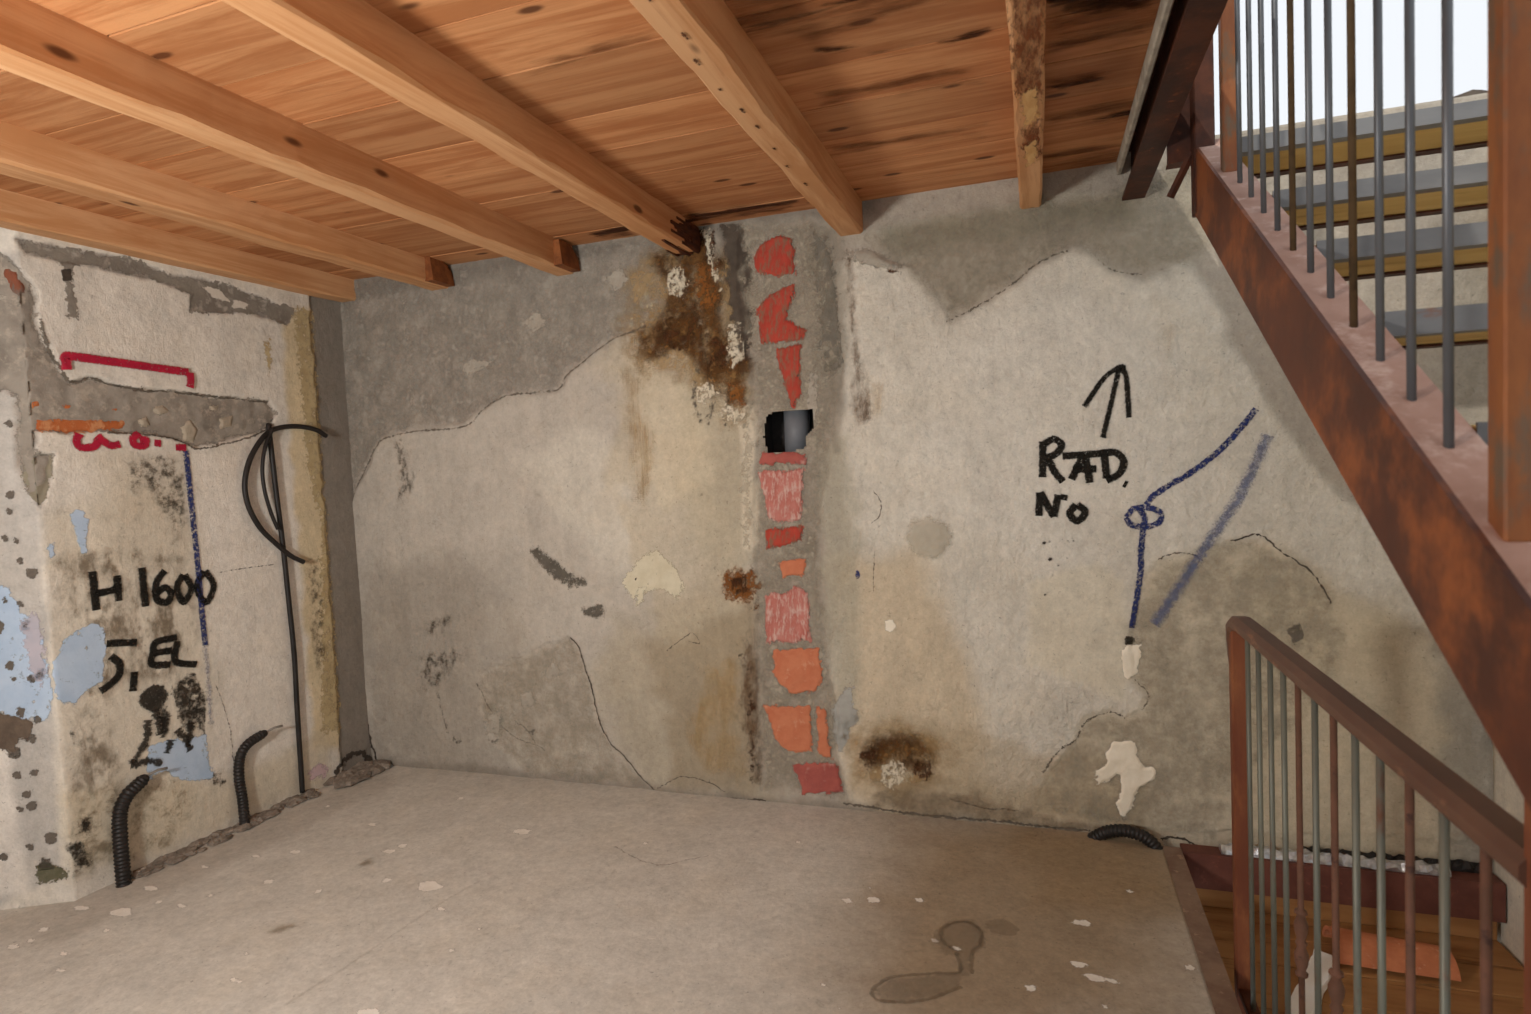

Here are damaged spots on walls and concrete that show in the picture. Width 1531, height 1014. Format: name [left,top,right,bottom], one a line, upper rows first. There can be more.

water stain [816,0,917,52]
water stain [940,30,988,43]
water stain [1007,0,1153,98]
water stain [864,74,931,91]
water stain [1018,101,1133,164]
rust [628,227,749,429]
spalling [0,240,341,734]
rust [718,568,762,609]
peeling [0,585,106,813]
water stain [159,662,206,734]
peeling [146,734,213,781]
rust [853,729,938,790]